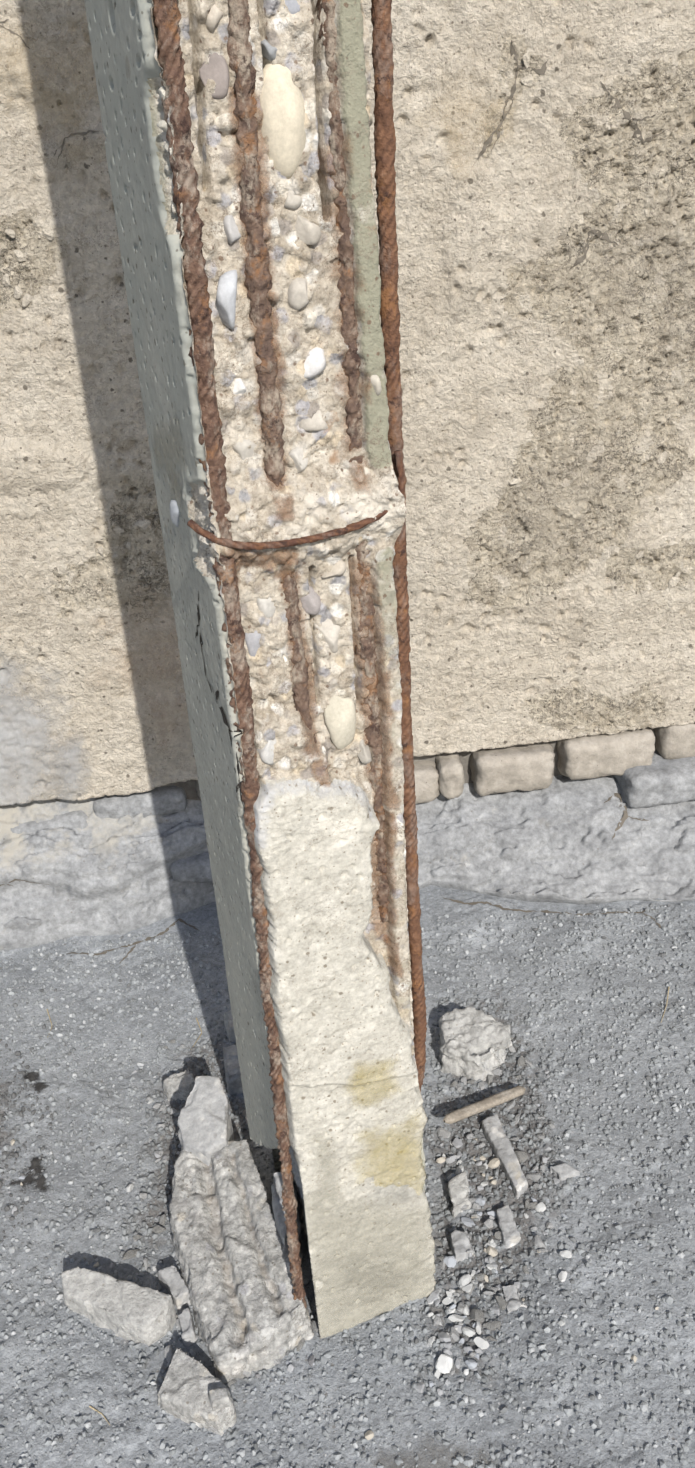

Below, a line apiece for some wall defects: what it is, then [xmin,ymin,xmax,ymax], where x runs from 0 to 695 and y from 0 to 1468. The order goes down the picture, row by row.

crack [195,593,246,814]
spalling [50,0,427,1308]
corrosion [360,656,398,962]